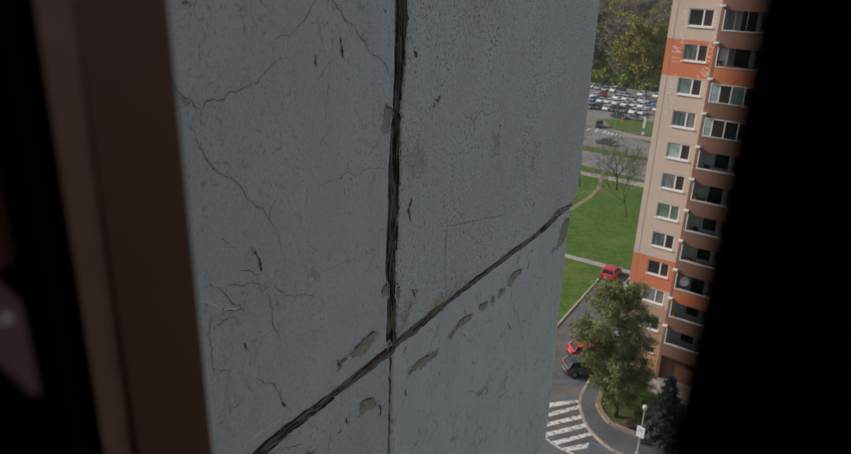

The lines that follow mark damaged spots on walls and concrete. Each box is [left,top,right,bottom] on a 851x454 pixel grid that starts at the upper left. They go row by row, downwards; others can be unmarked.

crack [176,1,392,252]
peeling [380,103,394,137]
crack [206,239,318,378]
peeling [446,263,530,342]
peeling [336,328,392,373]
peeling [405,348,440,394]
peeling [336,396,383,436]